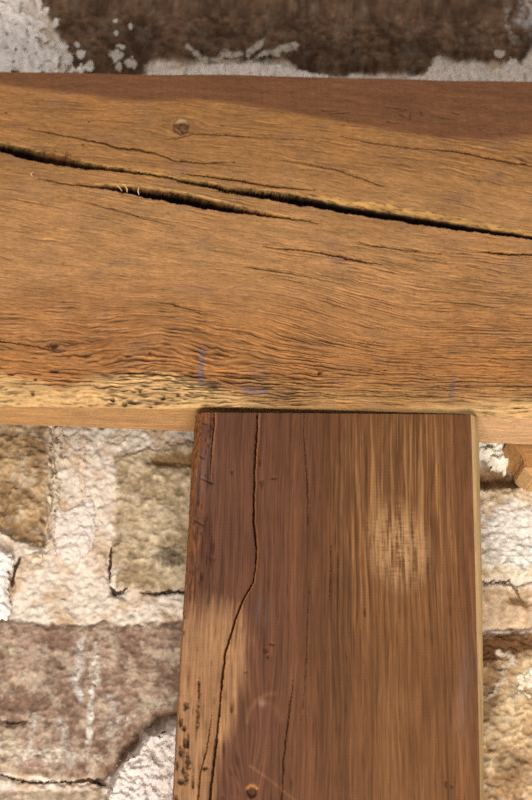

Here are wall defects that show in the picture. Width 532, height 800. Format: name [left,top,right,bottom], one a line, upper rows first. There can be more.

crack [0,128,532,256]
crack [198,414,259,800]